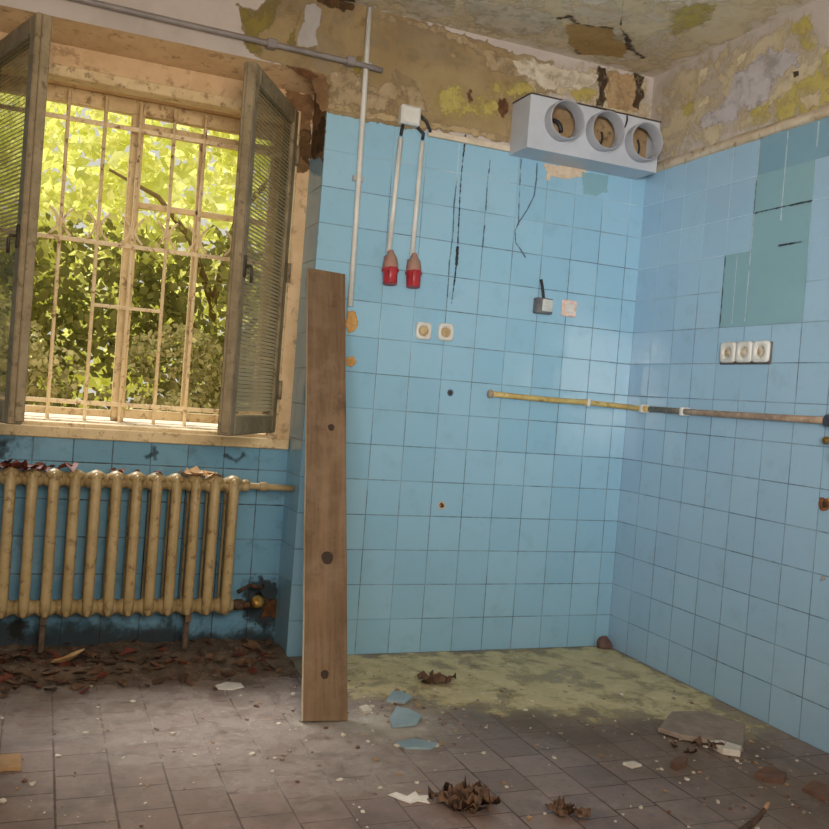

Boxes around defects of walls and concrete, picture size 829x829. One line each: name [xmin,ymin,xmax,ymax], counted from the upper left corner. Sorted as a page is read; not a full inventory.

spalling [557,15,645,59]
peeling [788,14,814,52]
peeling [236,0,556,173]
leakage [347,647,770,734]